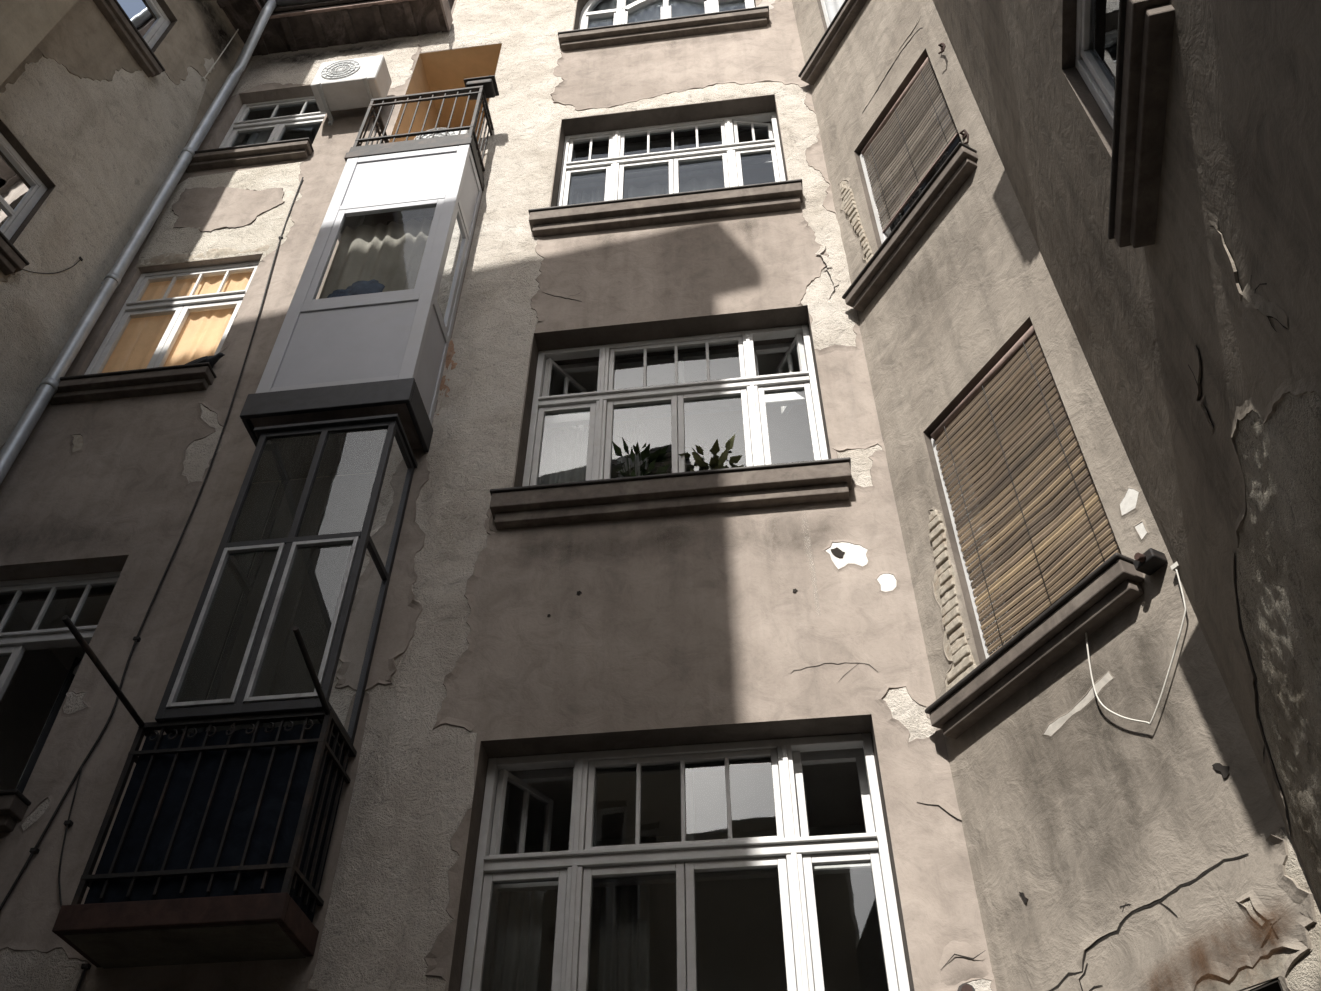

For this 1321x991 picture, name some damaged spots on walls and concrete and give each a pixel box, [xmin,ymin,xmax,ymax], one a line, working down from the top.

peeling [0,47,307,447]
peeling [176,401,228,489]
peeling [231,0,873,991]
peeling [831,438,886,492]
peeling [821,539,901,595]
flaking render [928,506,977,693]
flaking render [874,682,943,748]
peeling [1162,376,1321,991]
crack [1231,550,1291,836]
peeling [0,939,93,991]
peeling [928,972,997,991]
crack [1041,842,1249,991]